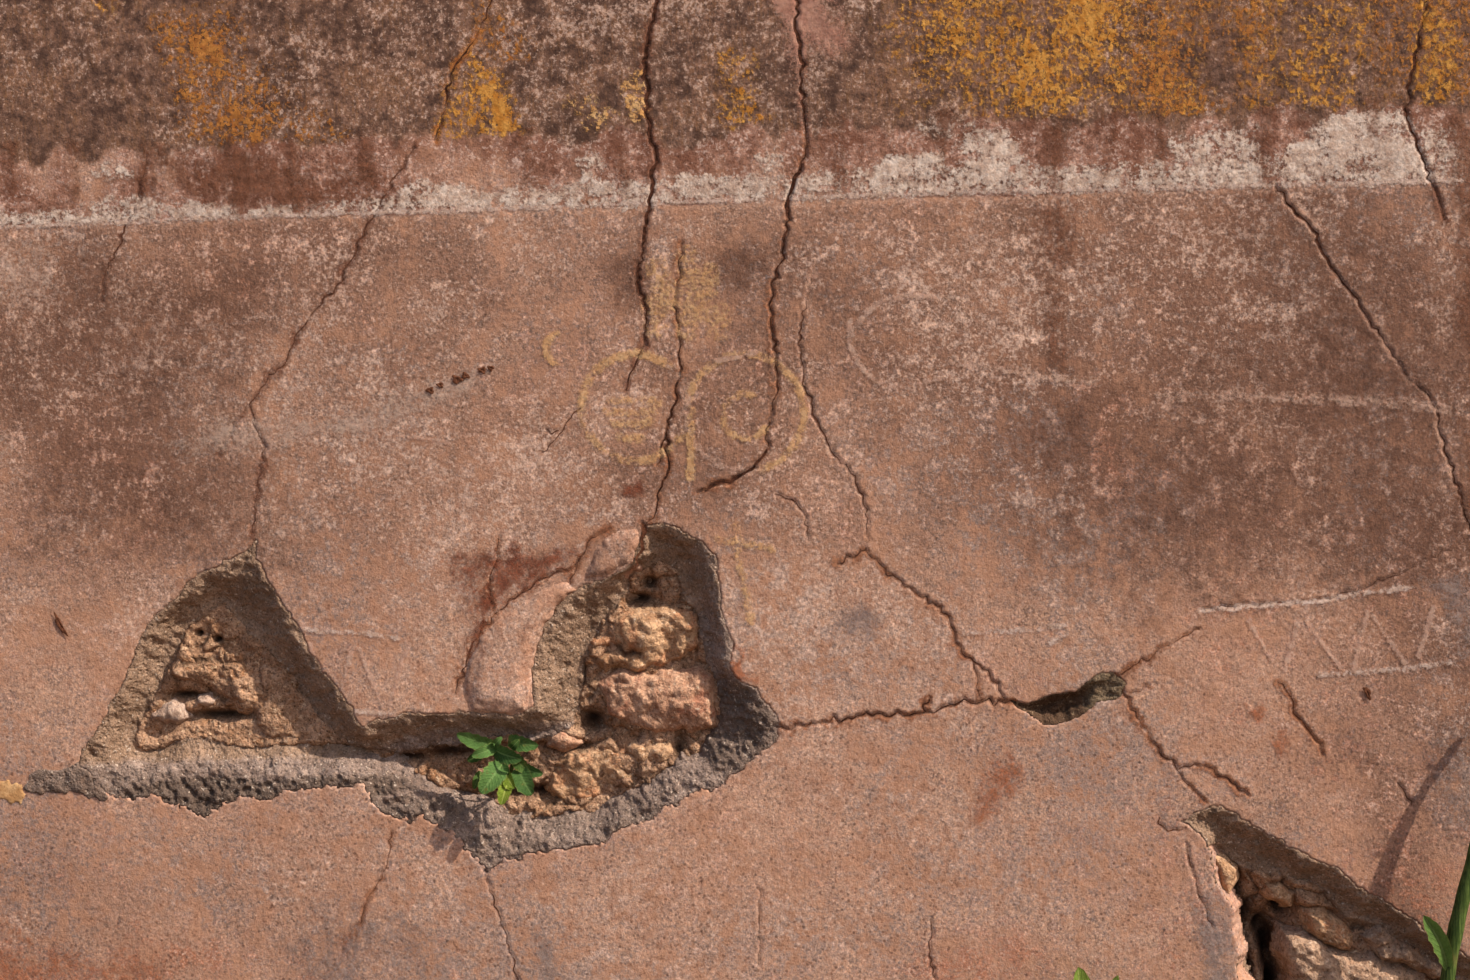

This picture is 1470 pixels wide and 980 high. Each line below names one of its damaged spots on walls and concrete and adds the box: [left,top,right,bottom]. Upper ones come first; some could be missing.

crack [215,0,492,539]
spalling [79,523,779,872]
crack [454,0,1018,737]
crack [1115,185,1470,925]
spalling [1180,805,1470,980]
crack [1399,0,1451,223]